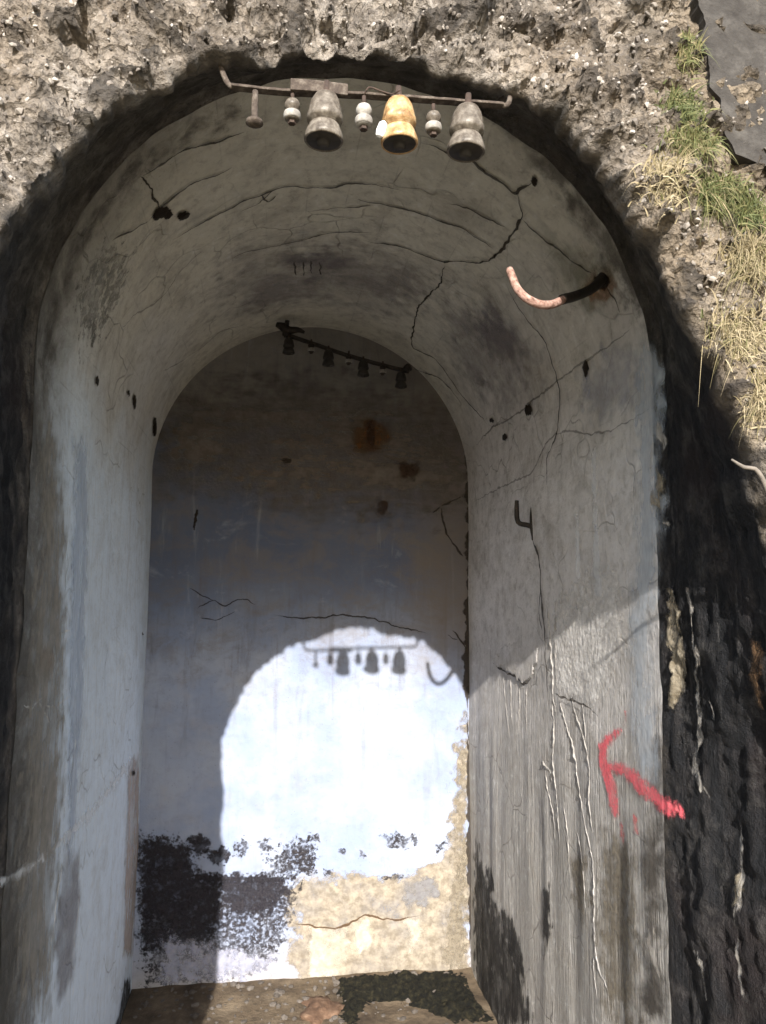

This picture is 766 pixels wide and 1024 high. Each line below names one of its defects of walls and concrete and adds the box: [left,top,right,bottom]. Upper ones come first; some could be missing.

crack [115,132,243,239]
rust [353,420,391,453]
crack [179,162,589,421]
crack [508,289,560,483]
crack [190,588,253,620]
crack [283,614,421,632]
water stain [116,830,331,1024]
crack [298,914,416,929]
peeling [282,743,471,979]
water stain [381,712,533,1024]